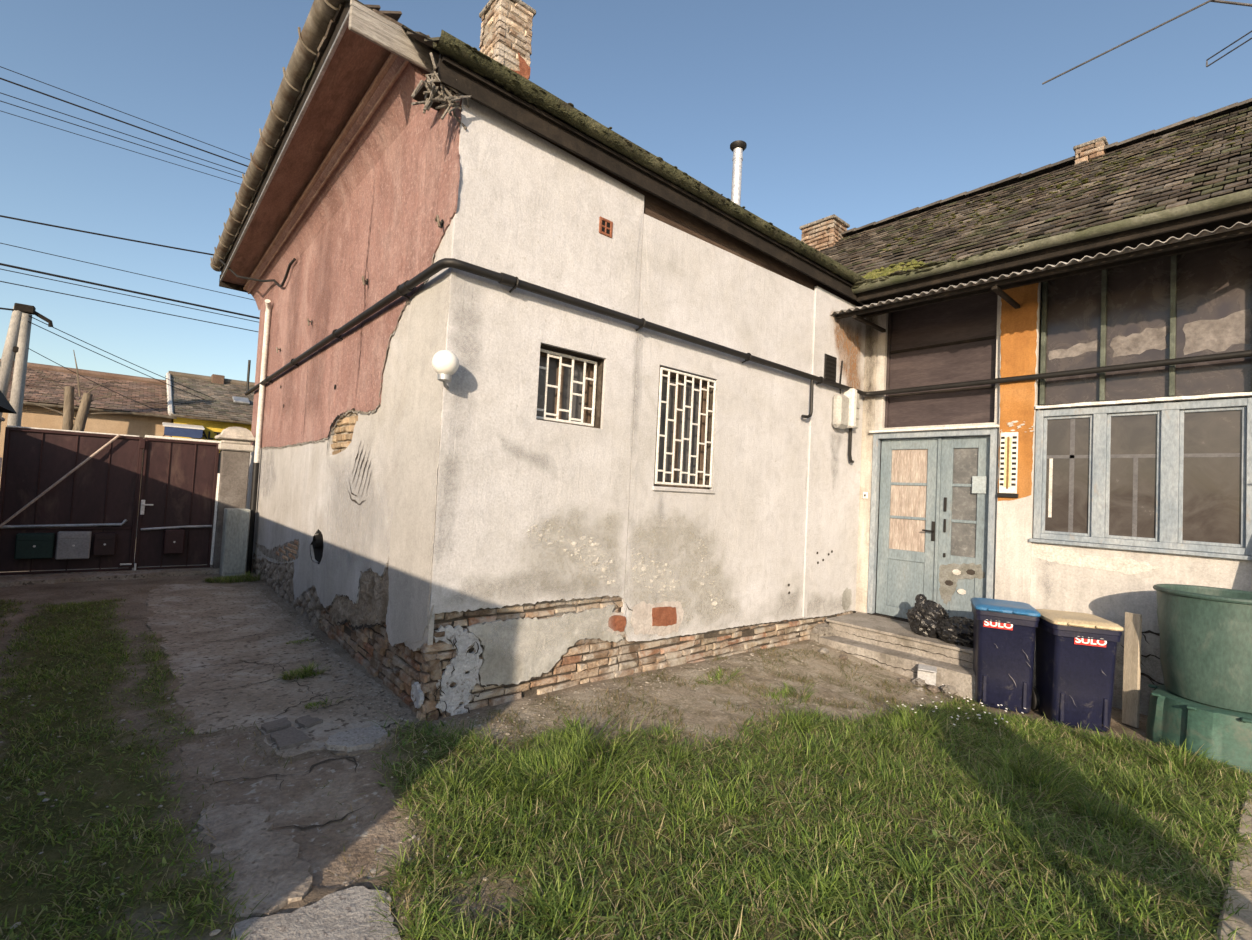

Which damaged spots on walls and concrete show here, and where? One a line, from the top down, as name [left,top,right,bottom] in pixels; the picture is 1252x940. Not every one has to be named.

spalling [262,280,426,455]
flaking render [318,521,853,721]